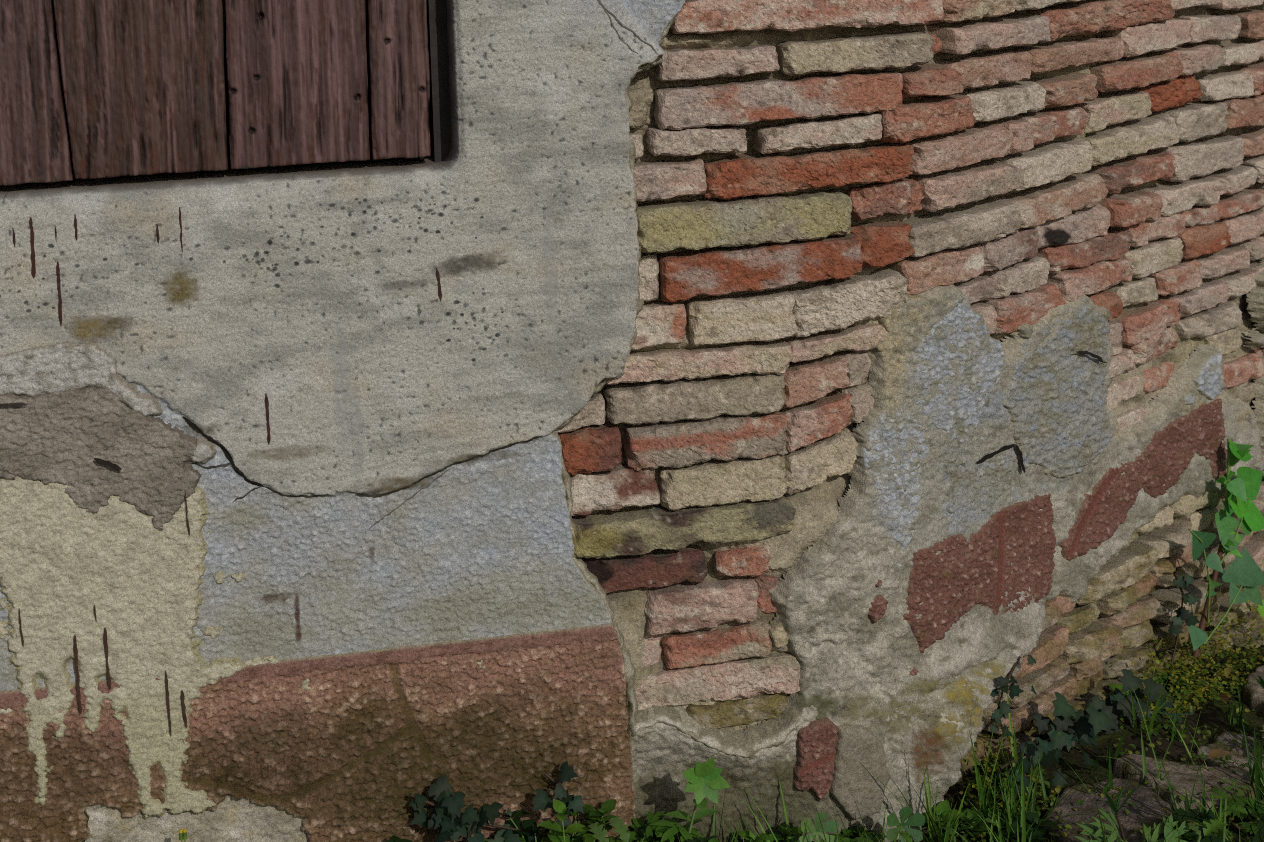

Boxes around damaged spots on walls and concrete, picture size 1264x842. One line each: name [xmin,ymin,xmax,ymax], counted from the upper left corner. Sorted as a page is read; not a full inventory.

crack [597,0,658,54]
corrosion [13,217,36,278]
flaking render [1242,259,1264,349]
flaking render [0,341,163,416]
crack [977,444,1025,473]
flaking render [853,294,1227,653]
corrosion [74,635,82,715]
corrosion [94,605,111,689]
corrosion [165,670,187,735]
corrosion [266,595,301,639]
spalling [574,557,839,800]
spalling [85,794,308,842]